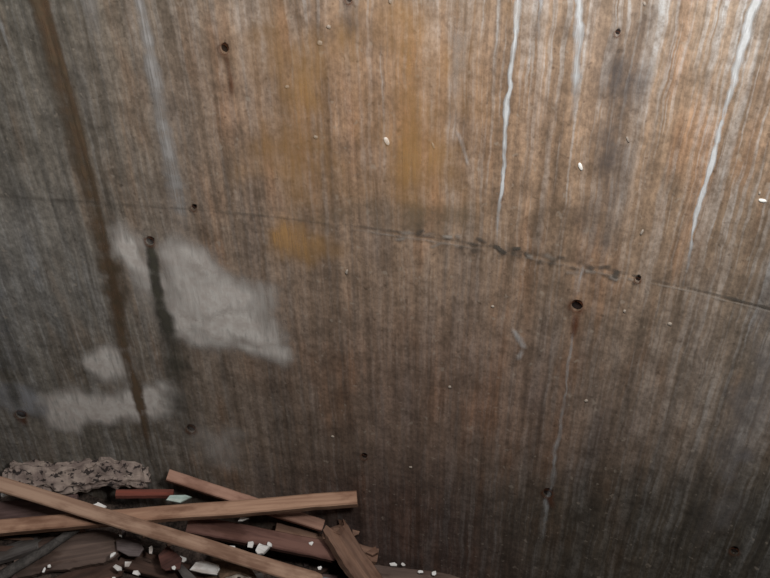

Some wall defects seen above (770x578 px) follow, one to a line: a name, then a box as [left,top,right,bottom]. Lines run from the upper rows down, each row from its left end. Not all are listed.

efflorescence [573,0,584,85]
efflorescence [498,0,521,210]
efflorescence [690,0,761,248]
crack [387,230,540,263]
crack [561,257,637,281]
water stain [112,226,290,375]
crack [707,292,770,309]
efflorescence [82,346,130,381]
water stain [16,383,180,432]